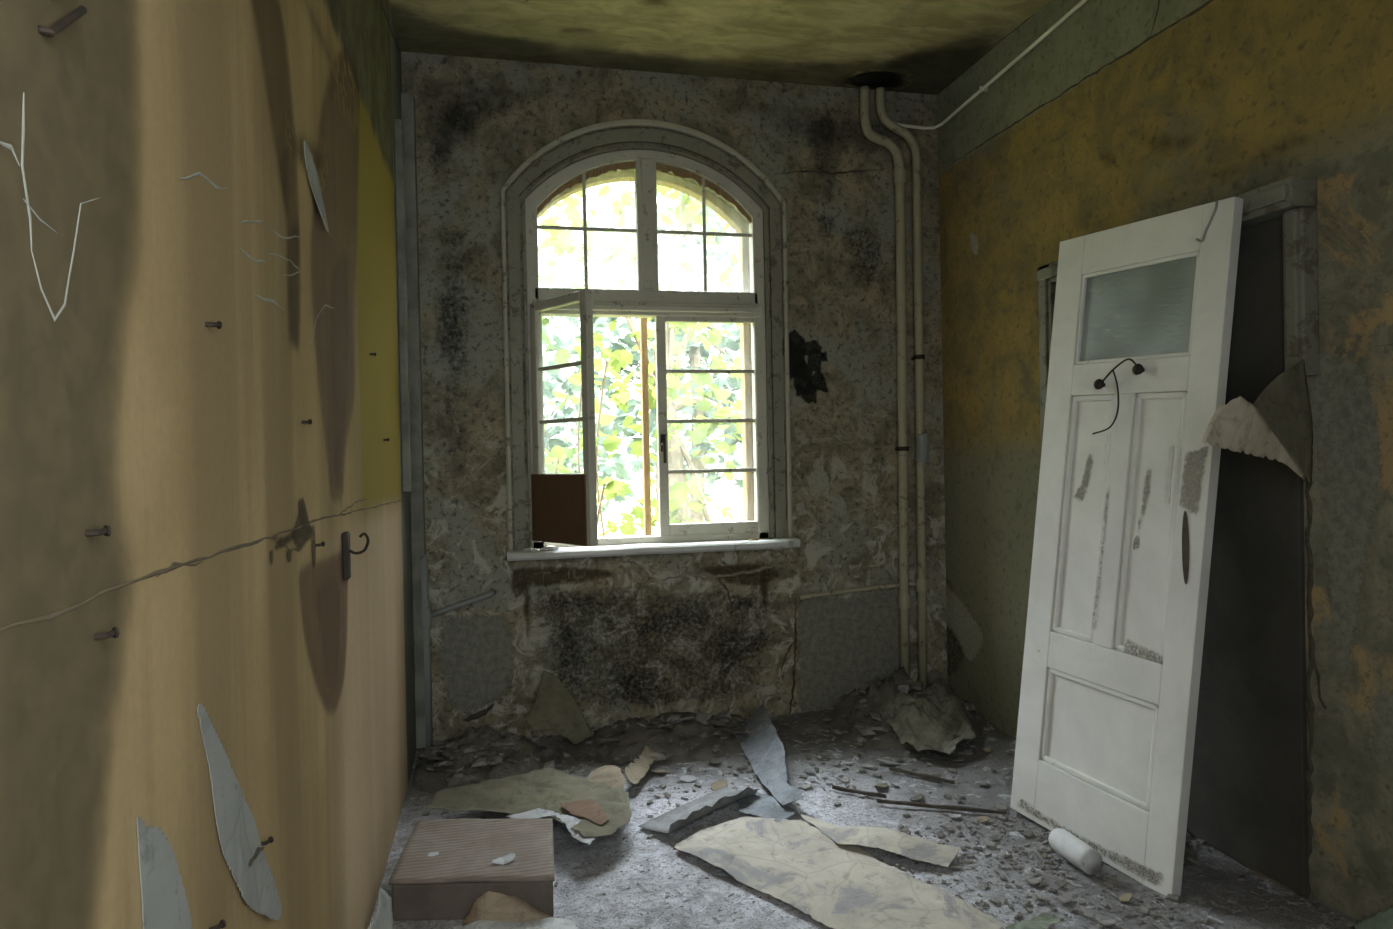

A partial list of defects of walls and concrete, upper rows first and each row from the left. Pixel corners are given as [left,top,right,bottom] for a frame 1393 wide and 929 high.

leakage [782,330,828,404]
leakage [1308,346,1383,697]
peeling [136,817,193,929]
peeling [197,703,282,921]